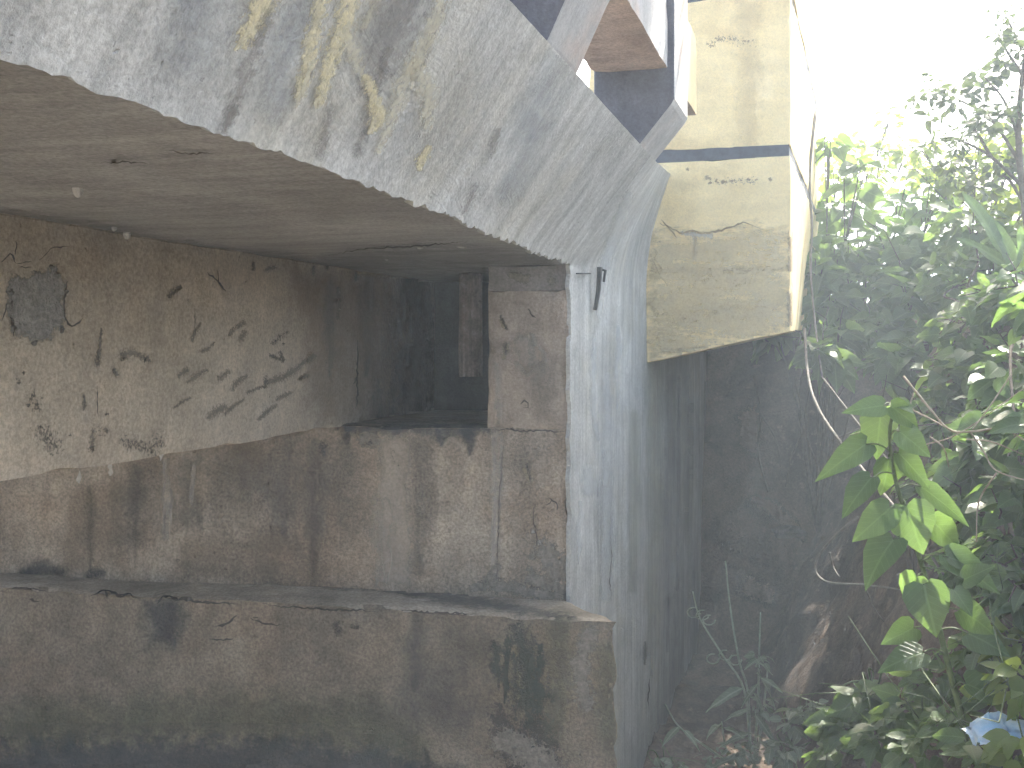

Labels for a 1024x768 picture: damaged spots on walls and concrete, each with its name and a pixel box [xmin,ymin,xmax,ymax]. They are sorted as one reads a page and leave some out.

crack [660,221,759,253]
spalling [5,265,69,346]
crack [91,589,375,641]
leakage [488,638,560,768]